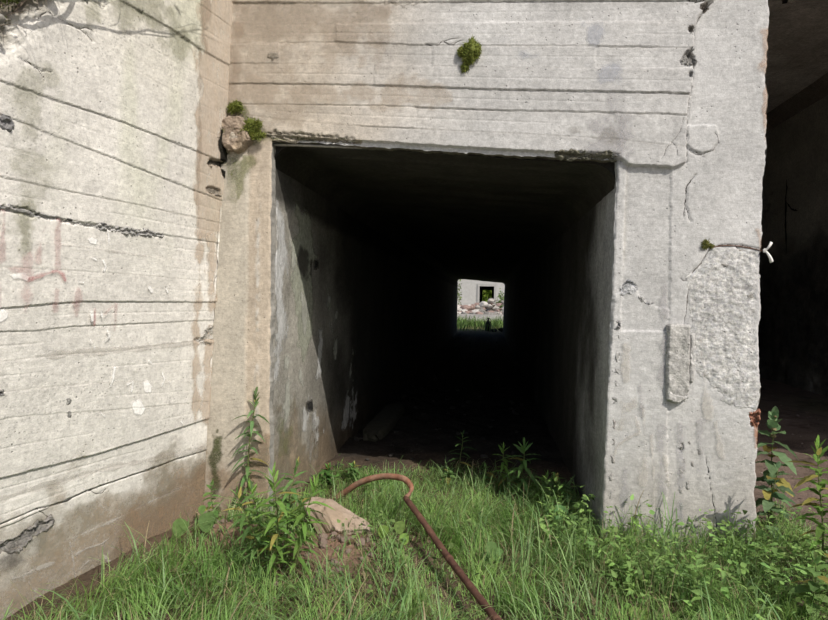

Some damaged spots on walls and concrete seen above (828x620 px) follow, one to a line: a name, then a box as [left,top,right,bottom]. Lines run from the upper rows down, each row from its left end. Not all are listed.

spalling [384,0,429,8]
spalling [679,46,698,77]
spalling [207,128,228,179]
spalling [0,204,163,238]
water stain [49,0,233,423]
spalling [0,514,55,554]